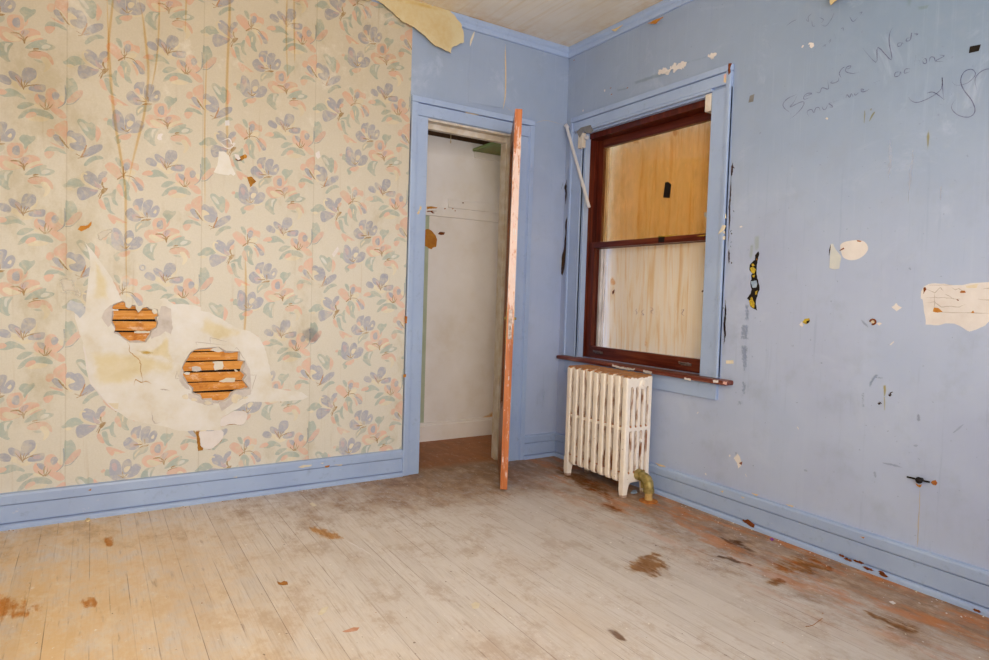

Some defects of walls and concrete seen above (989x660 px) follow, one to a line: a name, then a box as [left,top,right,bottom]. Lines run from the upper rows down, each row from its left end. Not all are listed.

peeling [829,240,868,269]
flaking render [109,301,159,343]
peeling [921,282,989,332]
flaking render [175,337,256,411]